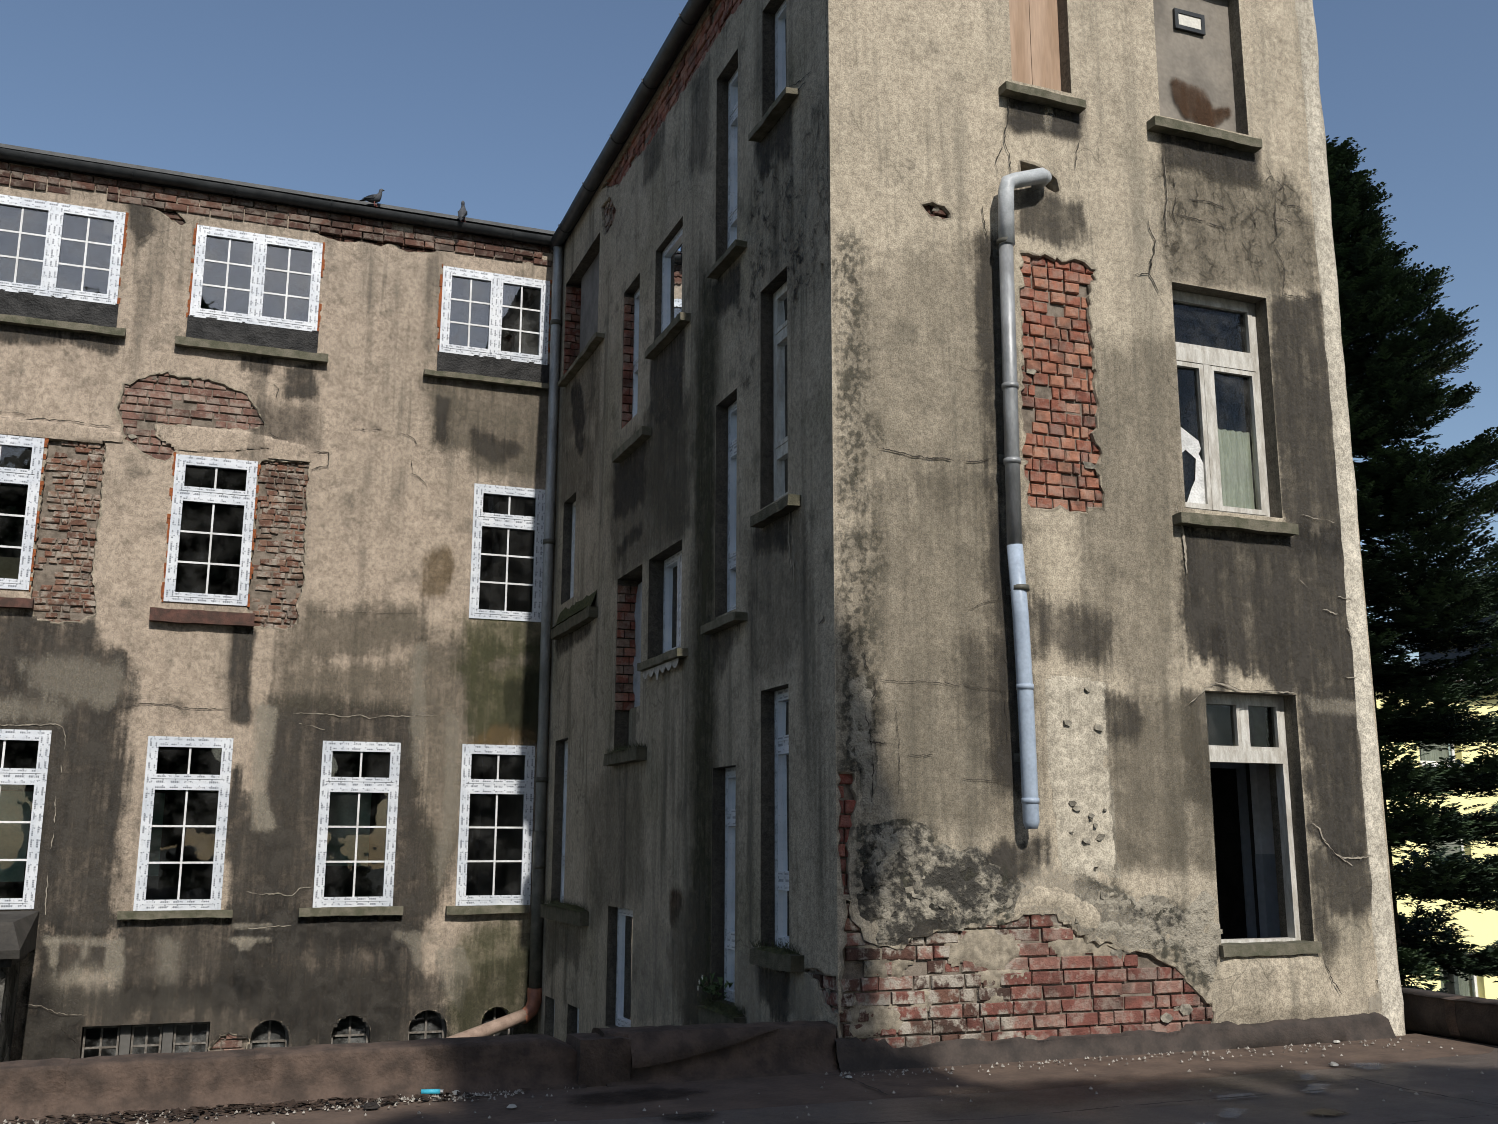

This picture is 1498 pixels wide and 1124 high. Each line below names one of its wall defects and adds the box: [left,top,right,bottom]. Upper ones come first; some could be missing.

spalling [601,0,743,238]
leakage [1160,133,1260,189]
flaking render [30,371,267,625]
flaking render [247,458,310,630]
spalling [1018,250,1106,517]
leakage [1106,292,1372,958]
leakage [0,604,539,1061]
leakage [886,883,948,944]
spalling [804,672,1223,1048]